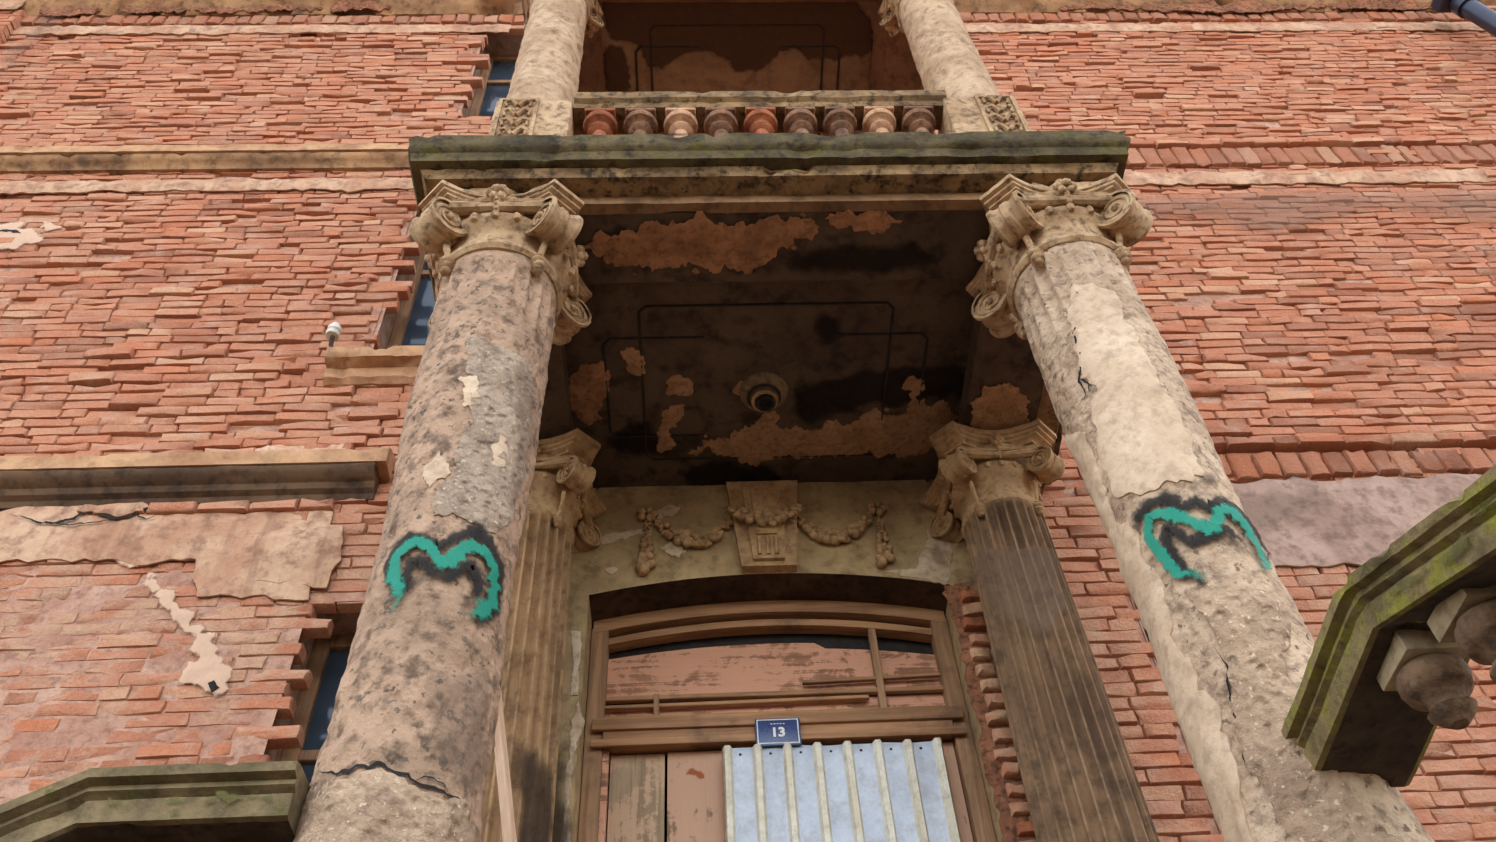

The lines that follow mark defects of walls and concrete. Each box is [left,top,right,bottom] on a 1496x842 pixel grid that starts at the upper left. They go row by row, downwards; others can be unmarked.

peeling [583,209,903,275]
peeling [568,346,646,426]
spalling [422,336,535,534]
peeling [656,374,1030,467]
crack [8,502,154,525]
flaking render [92,499,335,515]
flaking render [599,505,680,546]
flaking render [660,542,687,558]
flaking render [1064,283,1401,842]
spalling [883,529,1037,842]
crack [319,761,460,799]